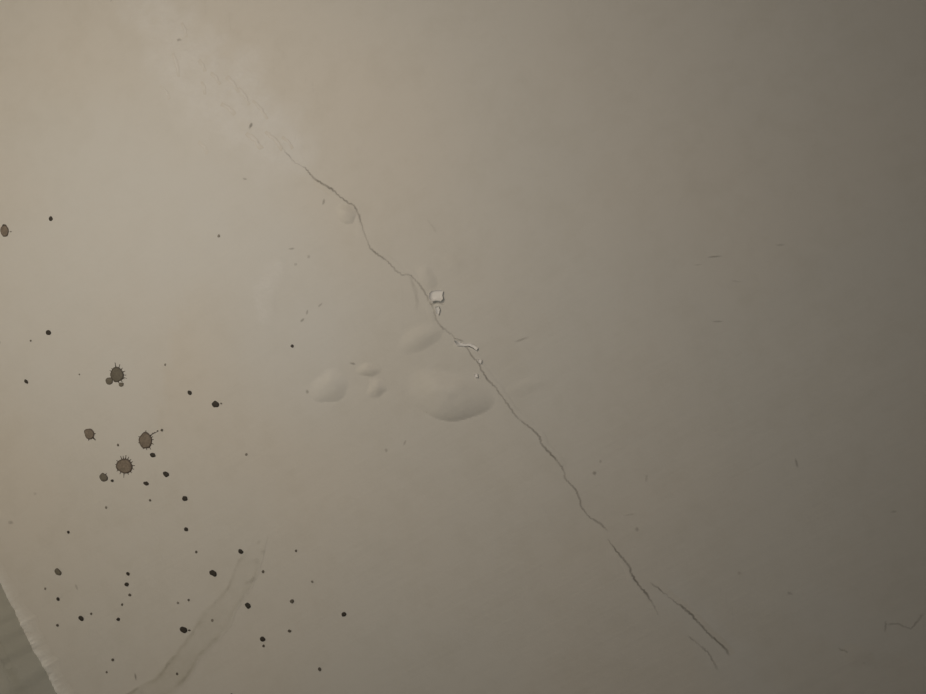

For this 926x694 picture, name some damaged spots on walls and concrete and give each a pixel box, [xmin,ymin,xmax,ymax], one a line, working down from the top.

water stain [124,529,268,694]